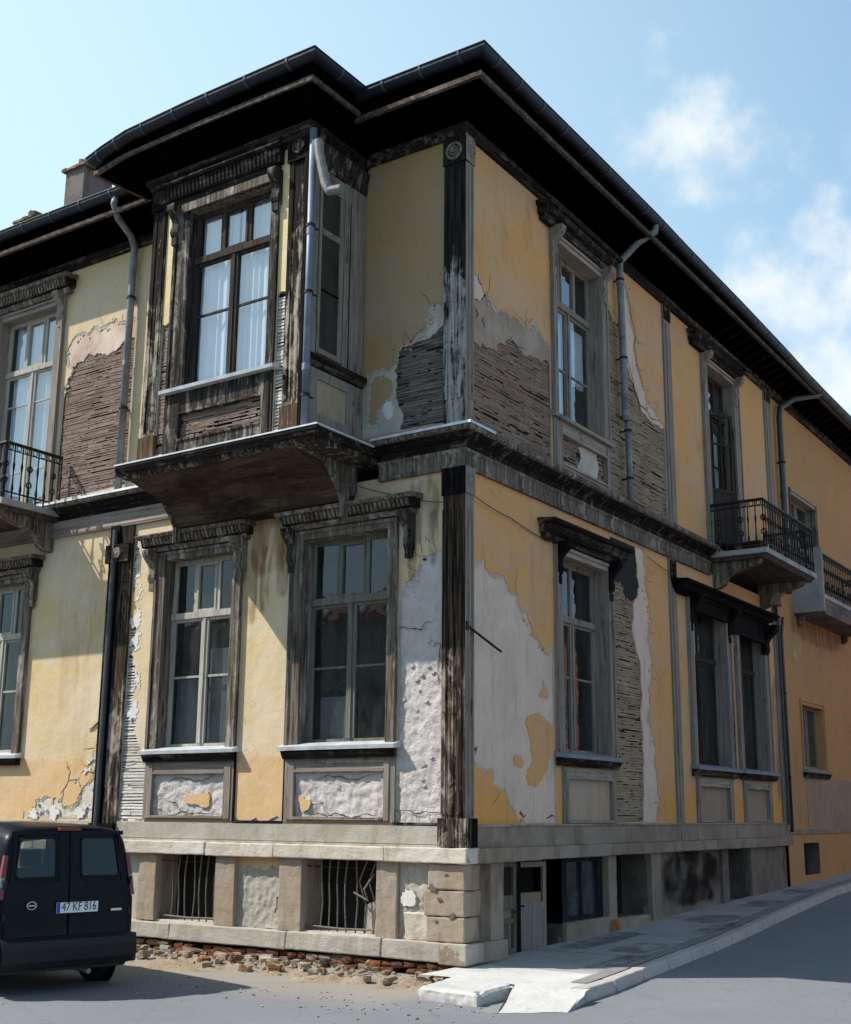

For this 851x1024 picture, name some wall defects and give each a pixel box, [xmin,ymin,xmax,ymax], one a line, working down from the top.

spalling [55,317,138,500]
flaking render [362,300,444,439]
flaking render [129,558,143,651]
flaking render [127,671,141,722]
flaking render [396,537,442,823]
flaking render [474,556,556,824]
spalling [609,536,661,823]
flaking render [24,748,96,820]
flaking render [153,773,224,816]
flaking render [295,771,383,817]
flaking render [236,857,281,929]